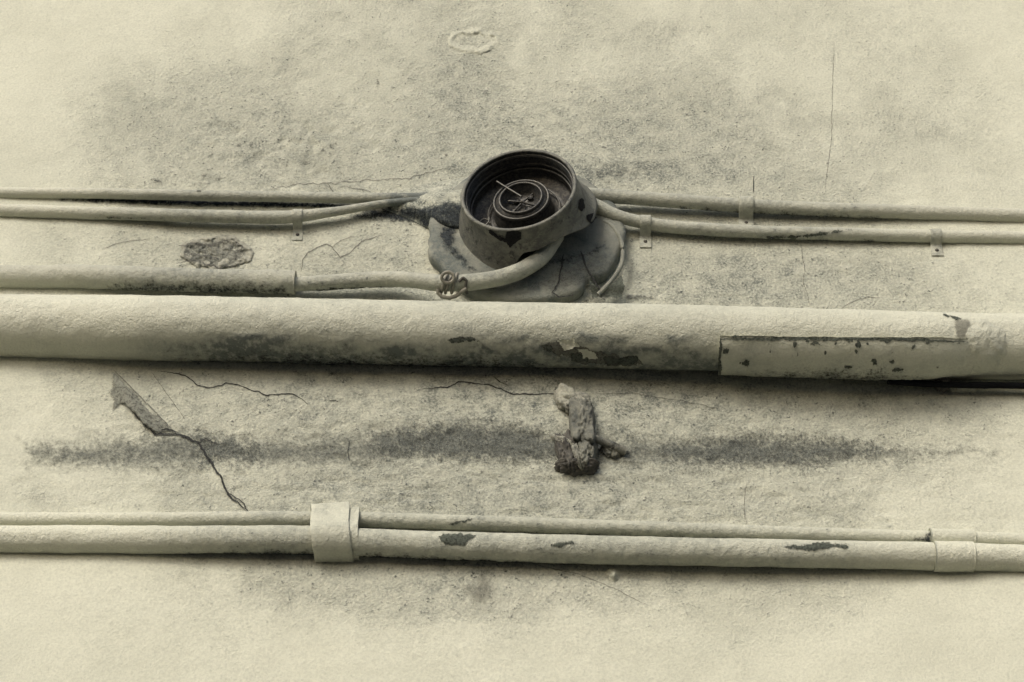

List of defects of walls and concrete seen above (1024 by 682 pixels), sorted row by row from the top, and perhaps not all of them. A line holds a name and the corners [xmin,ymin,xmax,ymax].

flaking render [178,234,254,269]
flaking render [110,372,172,432]
crack [423,376,553,395]
crack [133,371,304,511]
leakage [32,425,557,468]
leakage [598,432,933,467]